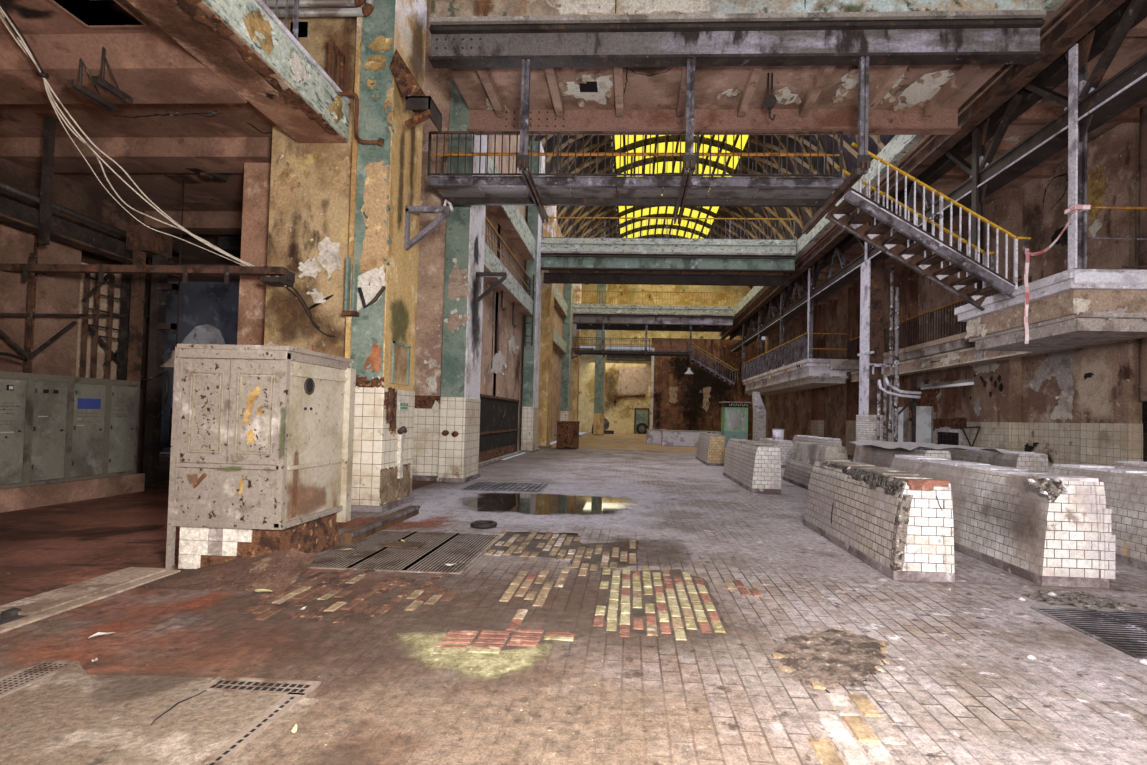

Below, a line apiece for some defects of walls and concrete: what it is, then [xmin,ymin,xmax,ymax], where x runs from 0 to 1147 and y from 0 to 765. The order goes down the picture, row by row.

spalling [172,0,346,135]
peeling [875,68,931,111]
peeling [298,236,341,304]
peeling [329,156,392,311]
peeling [1026,349,1094,423]
spalling [820,460,949,571]